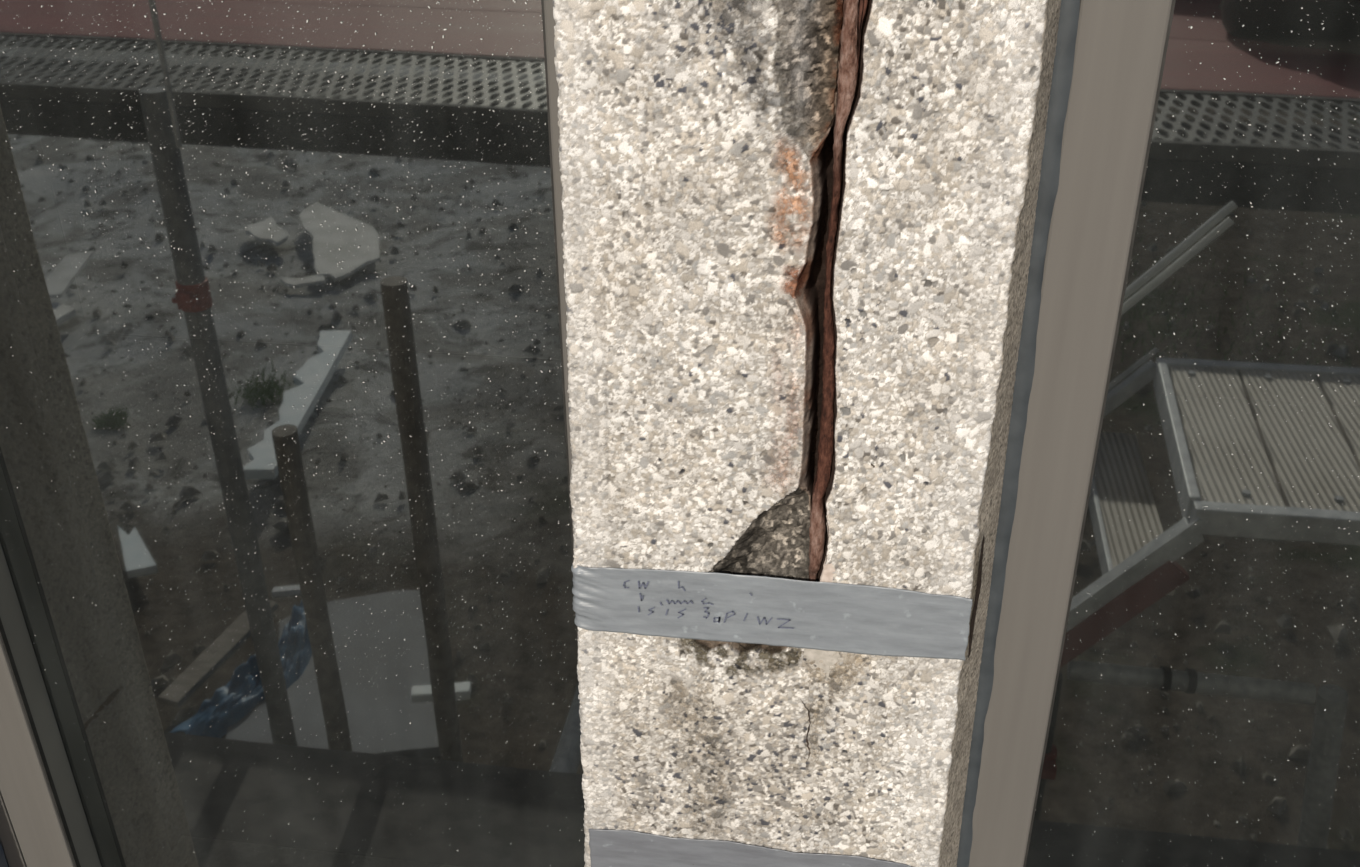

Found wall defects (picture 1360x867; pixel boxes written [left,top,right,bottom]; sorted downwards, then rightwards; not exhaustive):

spalling [771,0,843,159]
corrosion [835,0,868,72]
corrosion [784,267,803,299]
crack [795,0,873,582]
spalling [708,487,836,582]